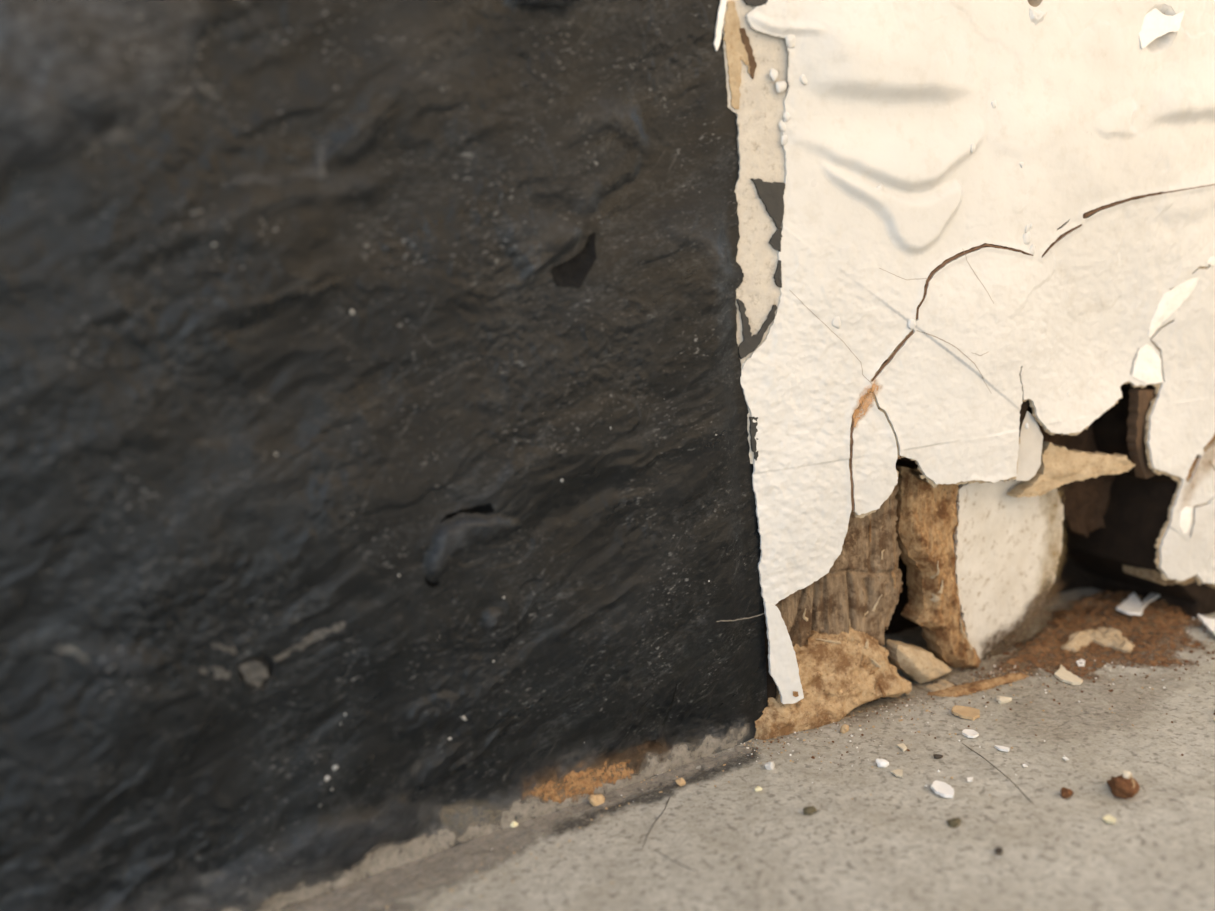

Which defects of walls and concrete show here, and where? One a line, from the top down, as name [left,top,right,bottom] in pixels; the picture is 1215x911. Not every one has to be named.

peeling [714,0,757,109]
crack [791,184,1215,511]
peeling [954,479,1064,659]
spalling [1117,565,1215,616]
peeling [1179,505,1197,534]
peeling [1054,659,1085,685]